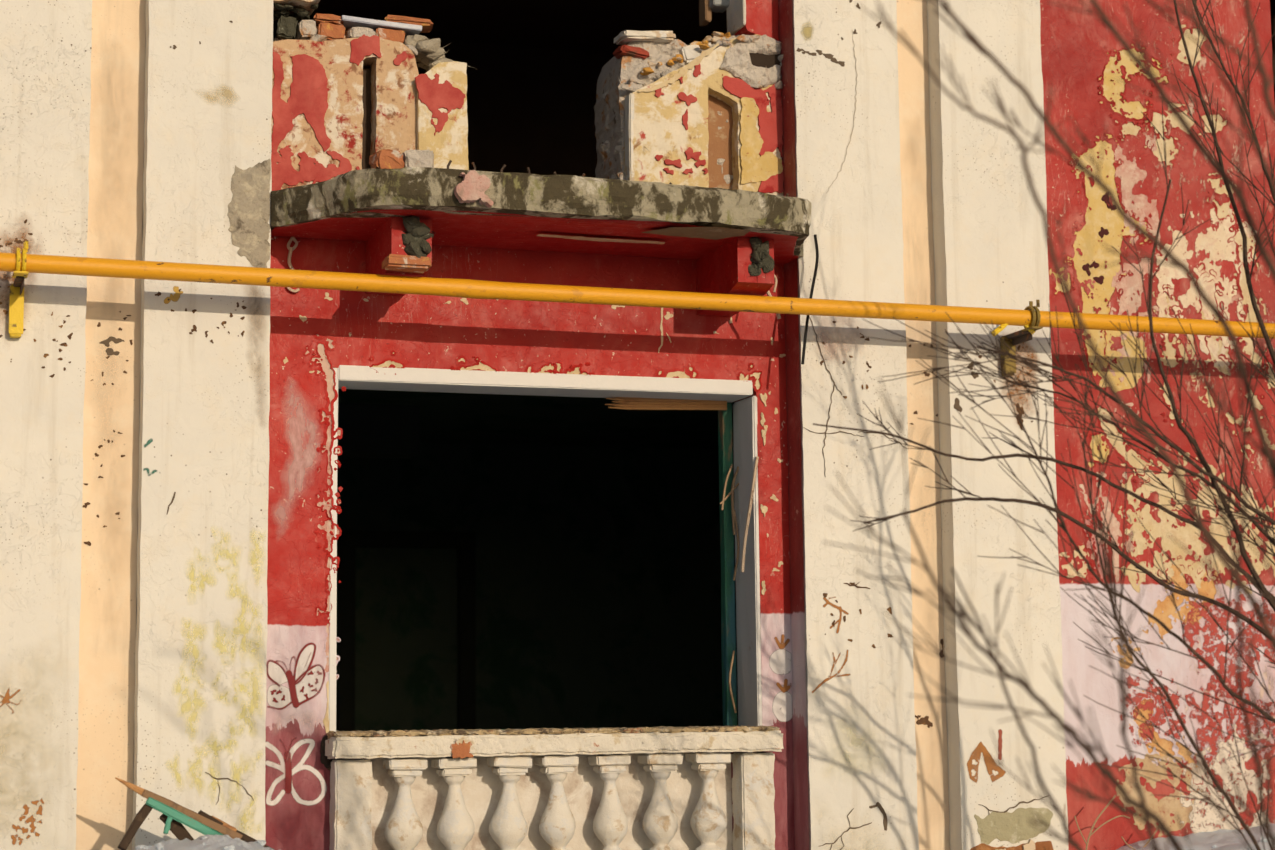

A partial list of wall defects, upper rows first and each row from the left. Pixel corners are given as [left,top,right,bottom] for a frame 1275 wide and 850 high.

peeling [228,3,453,268]
flaking render [613,30,784,193]
peeling [1048,21,1269,322]
peeling [283,315,352,770]
crack [803,316,902,477]
peeling [1059,329,1275,671]
flaking render [970,807,1054,850]
peeling [1116,688,1272,837]